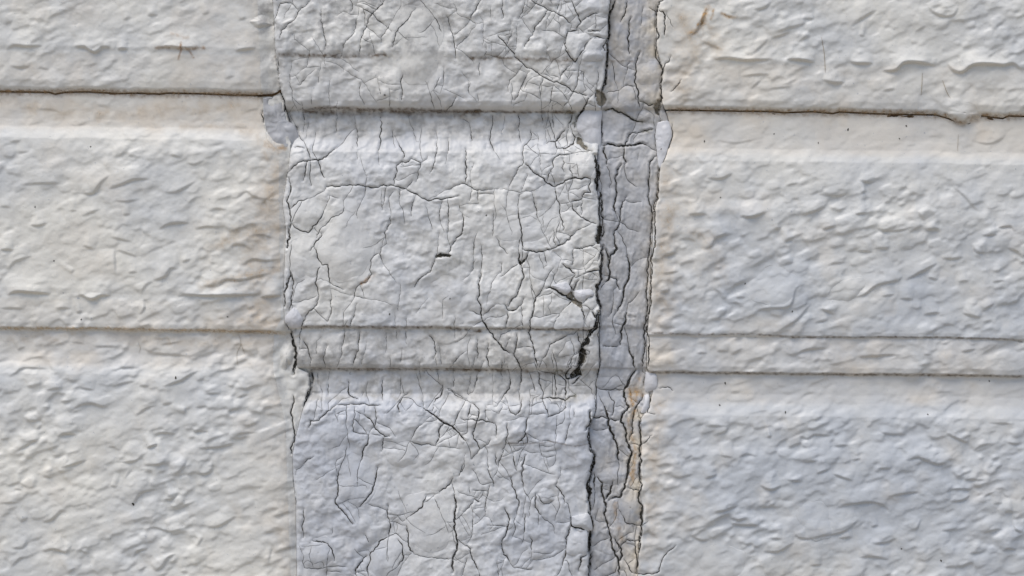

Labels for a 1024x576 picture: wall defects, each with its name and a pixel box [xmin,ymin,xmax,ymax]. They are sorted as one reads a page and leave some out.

crack [0,0,680,576]